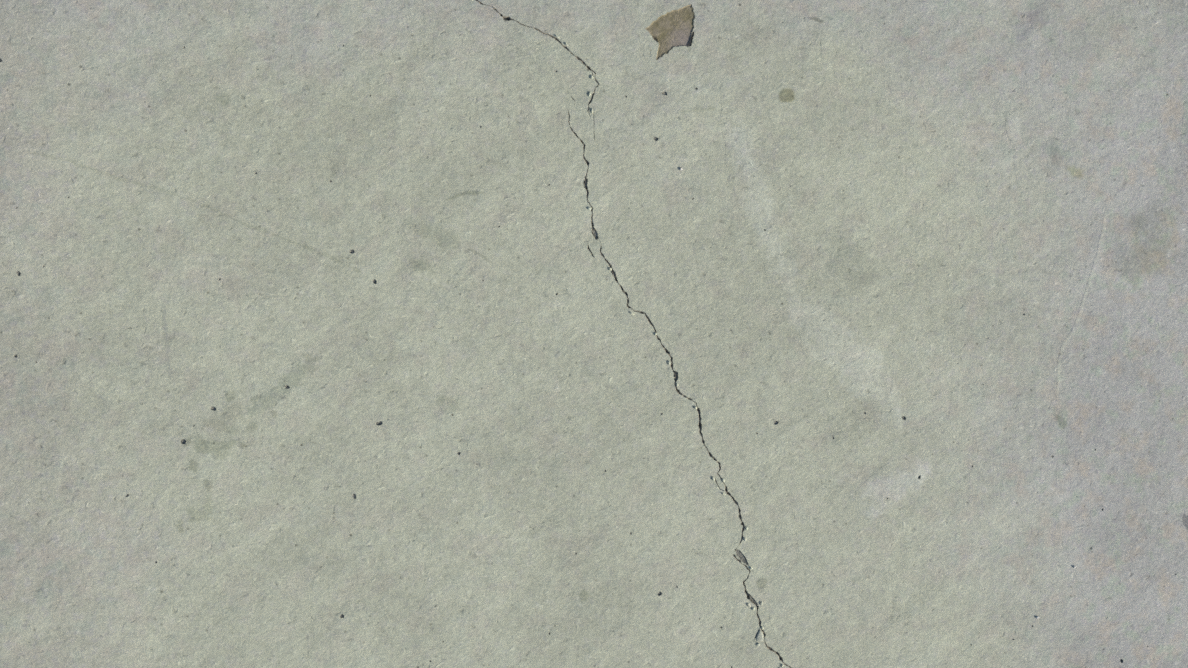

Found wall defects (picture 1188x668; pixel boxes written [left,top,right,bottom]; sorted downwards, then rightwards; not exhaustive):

crack [472,0,791,668]